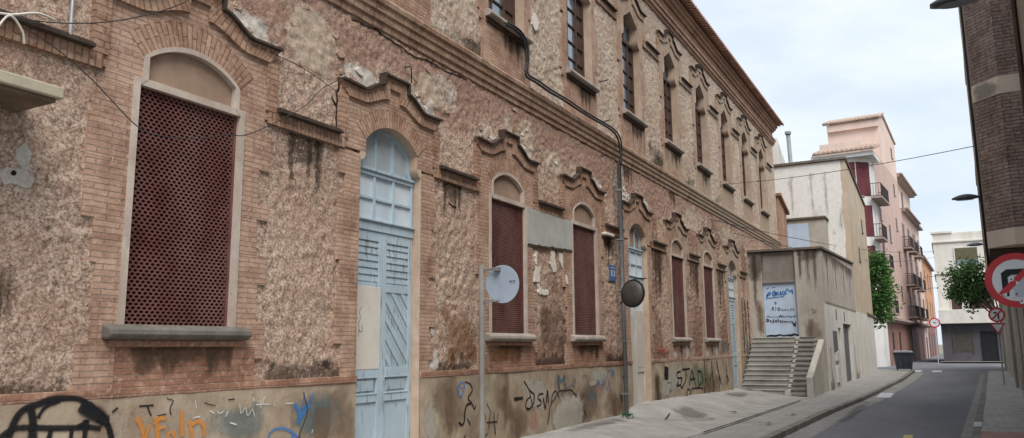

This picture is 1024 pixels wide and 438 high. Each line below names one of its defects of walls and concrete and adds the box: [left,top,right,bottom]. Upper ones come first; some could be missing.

peeling [233,1,378,87]
spalling [0,141,34,193]
leakage [288,133,323,180]
peeling [533,250,568,295]
leakage [134,347,232,370]